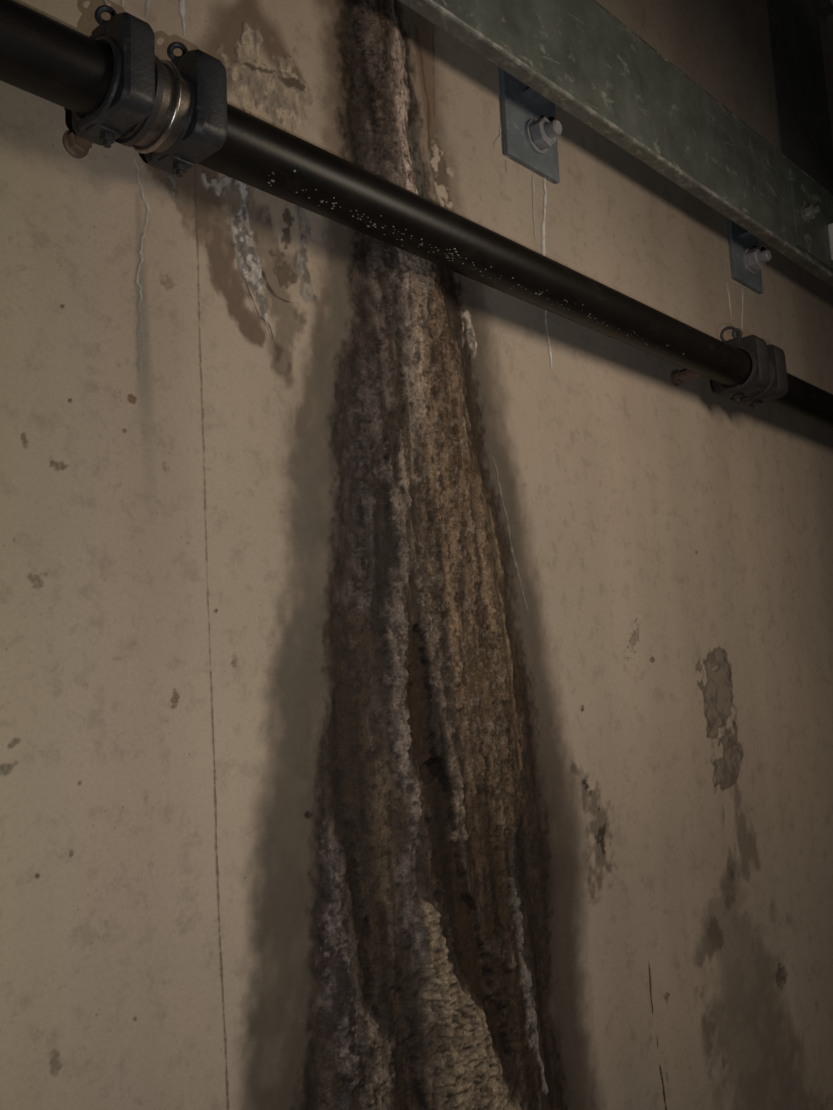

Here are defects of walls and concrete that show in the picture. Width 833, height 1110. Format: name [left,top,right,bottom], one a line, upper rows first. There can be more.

damp [205,0,313,133]
damp [327,0,441,206]
damp [134,156,595,1110]
peeling [696,647,744,789]
spalling [596,823,611,853]
crack [647,966,655,1012]
crack [657,1042,668,1110]